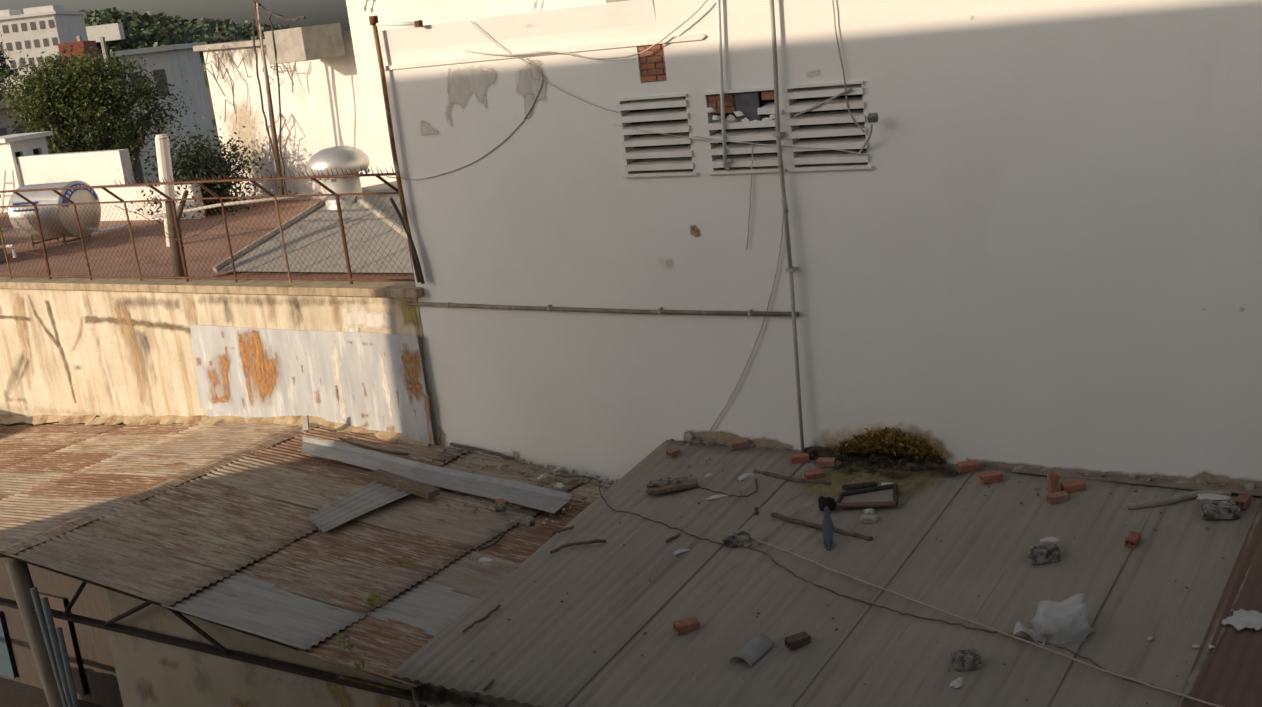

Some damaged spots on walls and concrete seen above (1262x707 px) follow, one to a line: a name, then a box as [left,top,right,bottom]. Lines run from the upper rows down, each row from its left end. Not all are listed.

peeling [421,69,497,135]
peeling [517,60,547,119]
water stain [114,304,146,387]
corrosion [197,331,277,405]
corrosion [397,344,432,442]